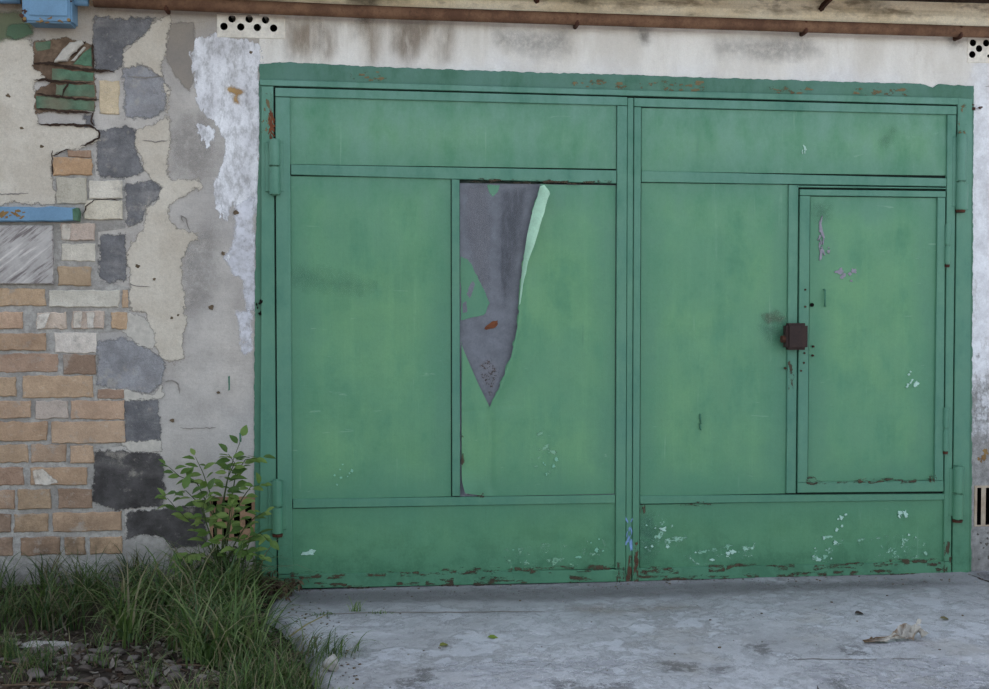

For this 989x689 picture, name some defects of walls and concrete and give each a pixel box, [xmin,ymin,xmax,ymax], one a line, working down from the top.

spalling [32,16,168,284]
peeling [189,32,271,354]
spalling [92,337,208,548]
rust [806,475,936,485]
peeling [625,515,686,551]
rust [290,542,759,589]
peeling [689,543,755,564]
rust [768,562,862,577]
rust [873,541,952,575]